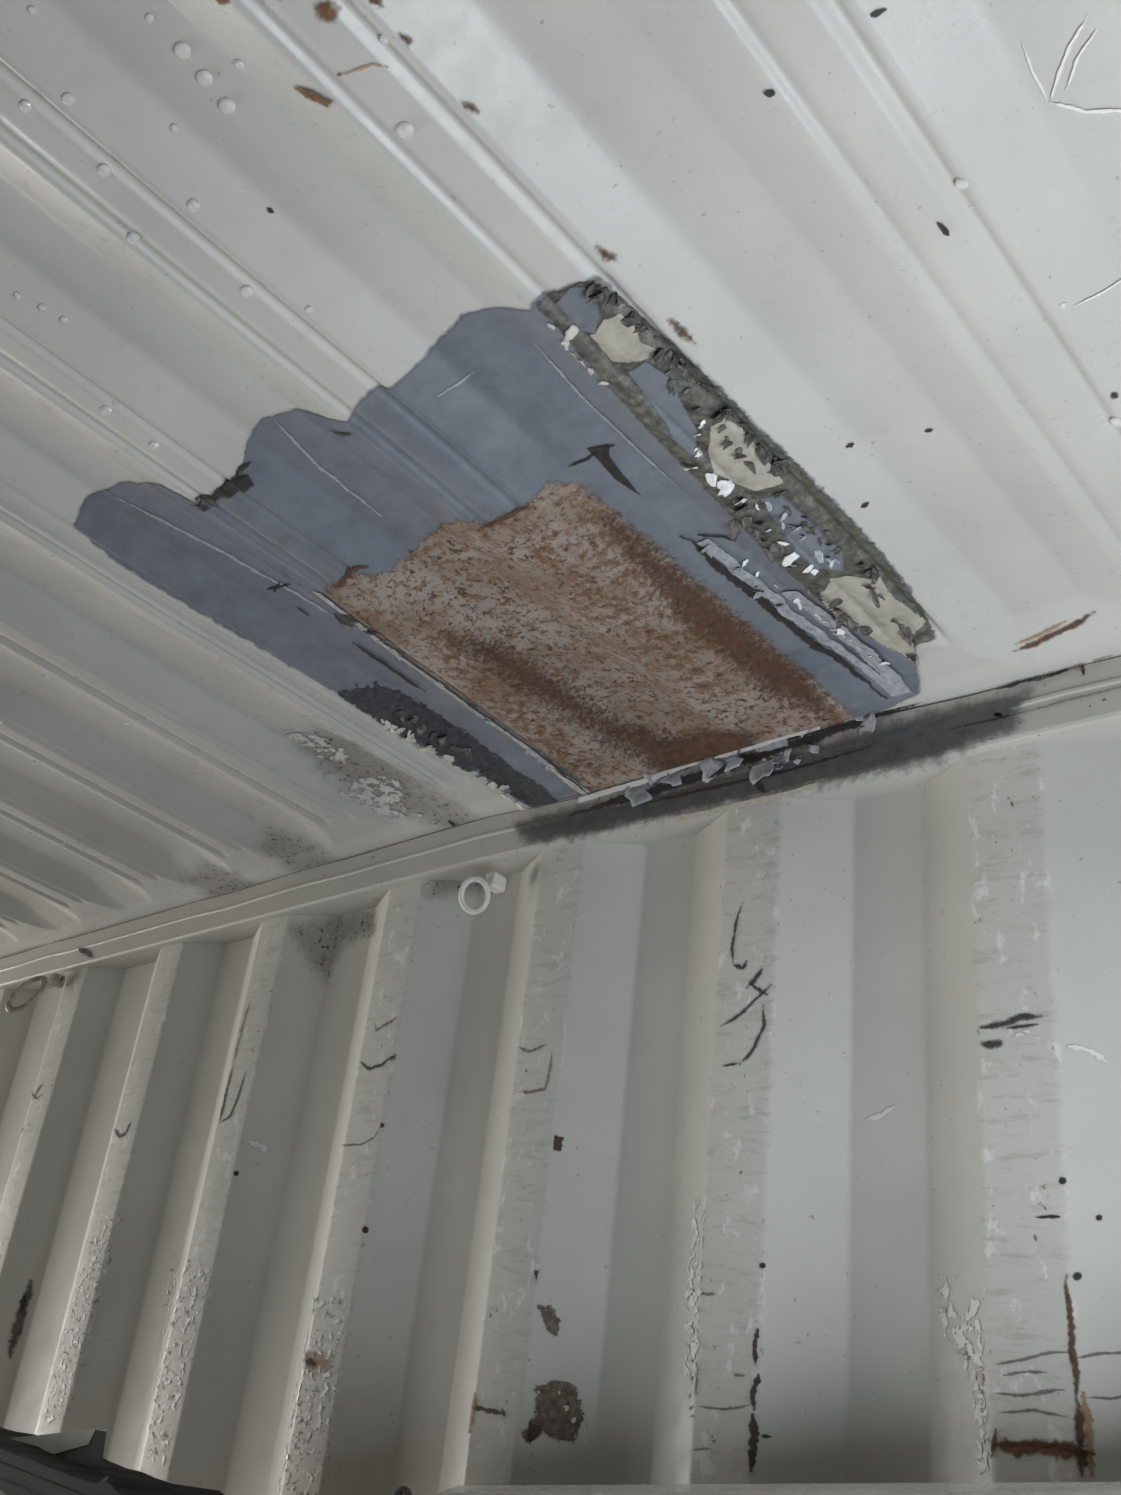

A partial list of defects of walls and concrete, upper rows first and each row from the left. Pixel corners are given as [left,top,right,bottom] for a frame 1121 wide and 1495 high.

peeling [537,278,937,666]
corrosion [325,480,854,793]
peeling [282,730,423,821]
peeling [338,681,557,811]
peeling [769,744,822,770]
peeling [936,1275,991,1475]
corrosion [990,1276,1096,1477]